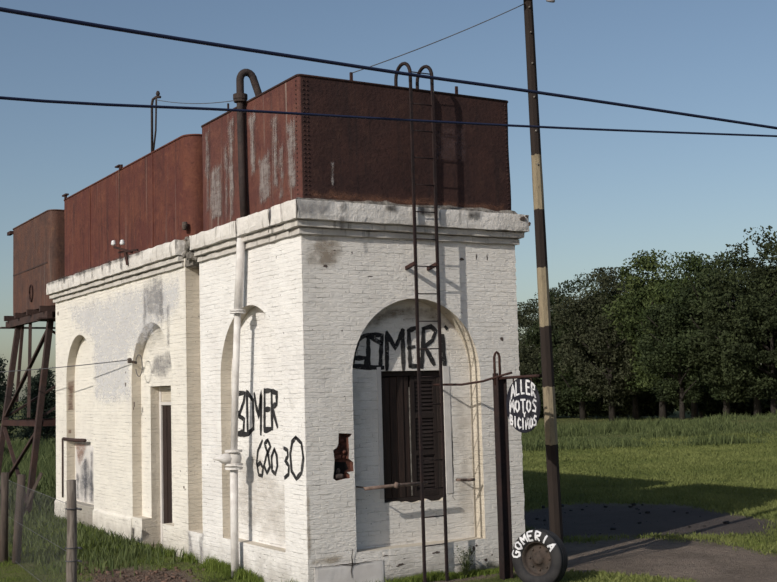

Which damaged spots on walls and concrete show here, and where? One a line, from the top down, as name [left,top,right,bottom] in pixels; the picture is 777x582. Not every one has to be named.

spalling [333,433,353,481]